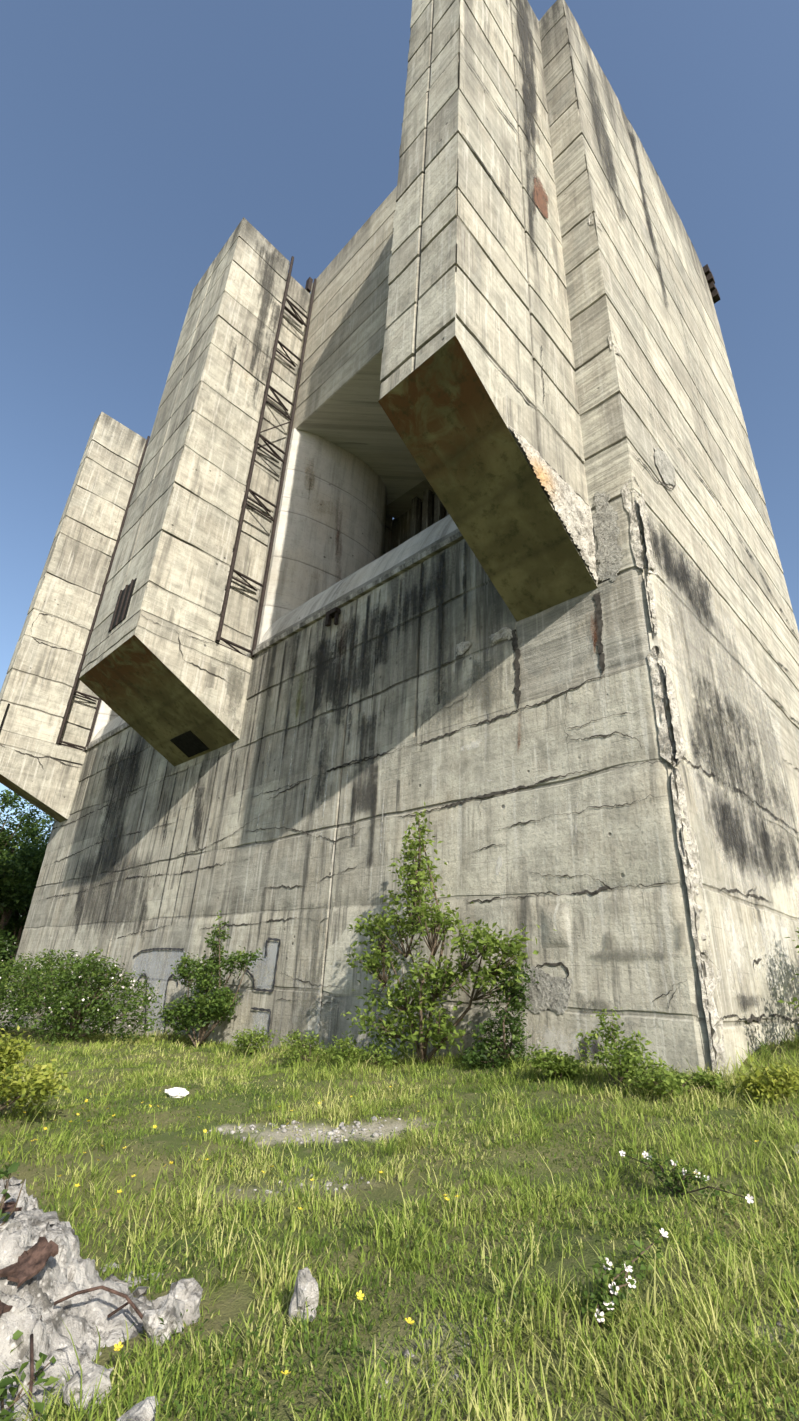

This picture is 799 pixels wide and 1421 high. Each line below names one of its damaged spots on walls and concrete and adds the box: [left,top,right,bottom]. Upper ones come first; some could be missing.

water stain [517,0,540,251]
rust [533,177,548,218]
water stain [587,59,626,218]
water stain [629,132,667,306]
water stain [648,521,723,635]
crack [1,745,79,770]
water stain [79,553,444,926]
crack [39,660,798,940]
spalling [509,425,727,1078]
water stain [689,676,799,883]
crack [535,962,569,980]
crack [716,1014,799,1028]